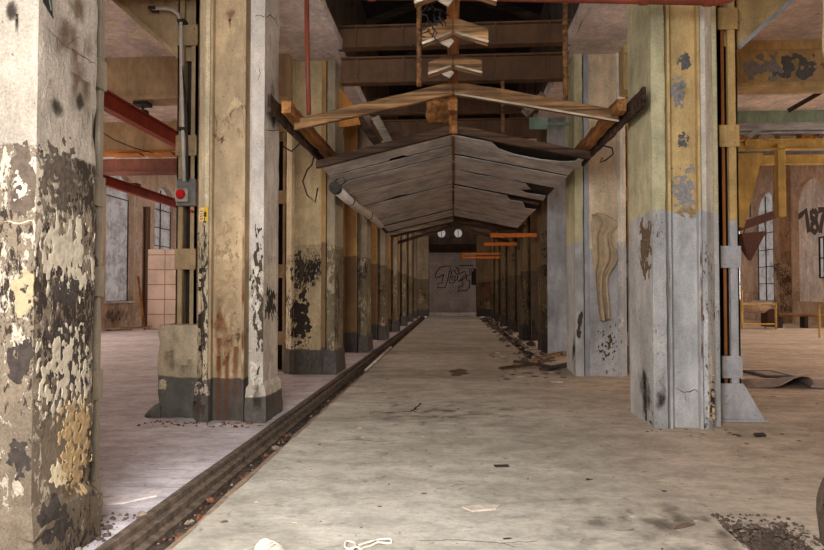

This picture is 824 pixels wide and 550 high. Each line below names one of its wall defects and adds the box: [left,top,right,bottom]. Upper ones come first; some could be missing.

peeling [670,52,692,108]
peeling [743,51,824,81]
peeling [678,131,690,148]
peeling [671,164,696,219]
flaking render [639,217,652,280]
peeling [252,224,278,375]
peeling [290,248,312,347]
peeling [6,137,95,545]
peeling [598,324,617,374]